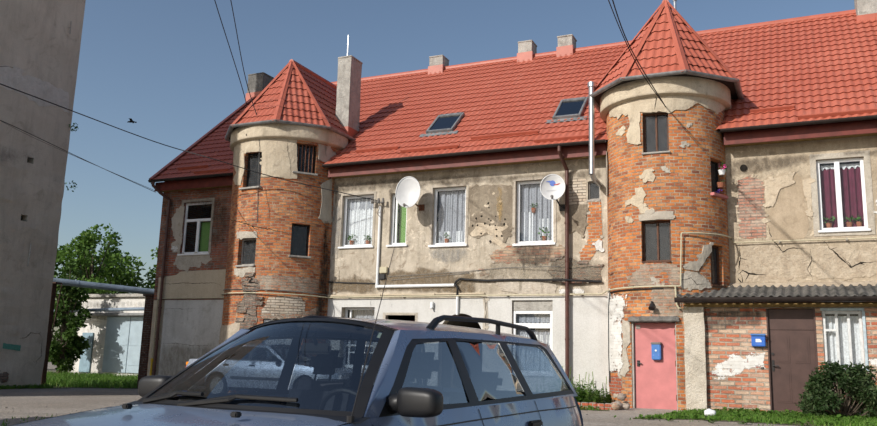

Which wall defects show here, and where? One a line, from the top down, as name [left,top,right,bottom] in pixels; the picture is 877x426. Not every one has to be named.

spalling [0,65,69,113]
peeling [625,166,675,223]
peeling [171,206,197,268]
spalling [218,266,313,345]
peeling [468,178,639,398]
peeling [650,242,714,291]
spalling [735,172,815,283]
crack [768,226,876,280]
peeling [712,352,766,380]